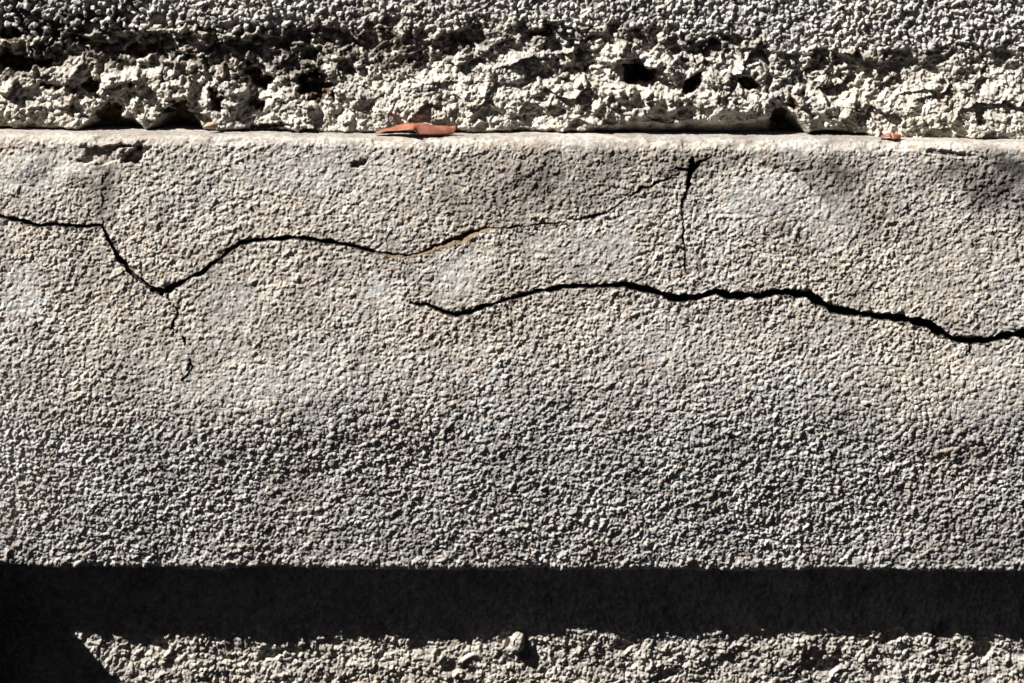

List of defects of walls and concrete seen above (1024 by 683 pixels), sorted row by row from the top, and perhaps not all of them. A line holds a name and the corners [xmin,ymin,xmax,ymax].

crack [0,156,1024,381]